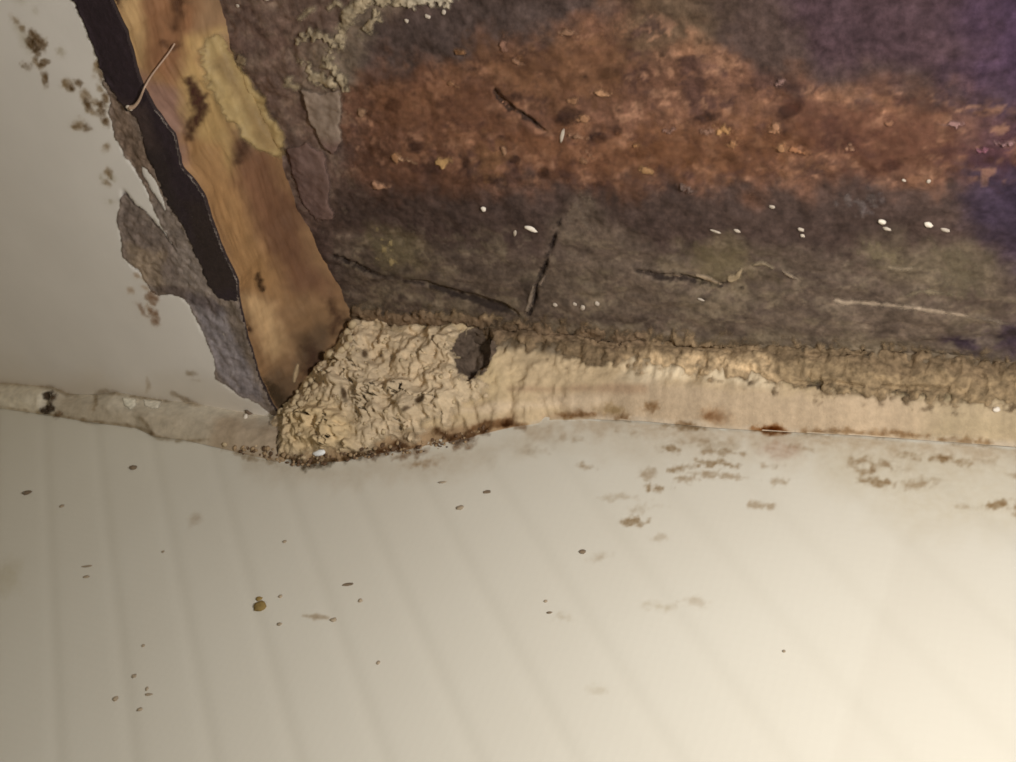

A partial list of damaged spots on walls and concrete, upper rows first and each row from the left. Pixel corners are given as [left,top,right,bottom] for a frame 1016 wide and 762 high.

water stain [27,31,47,83]
water stain [284,0,452,95]
water stain [187,77,207,138]
spalling [72,0,1016,462]
crack [334,255,378,275]
crack [403,219,561,315]
water stain [834,255,968,316]